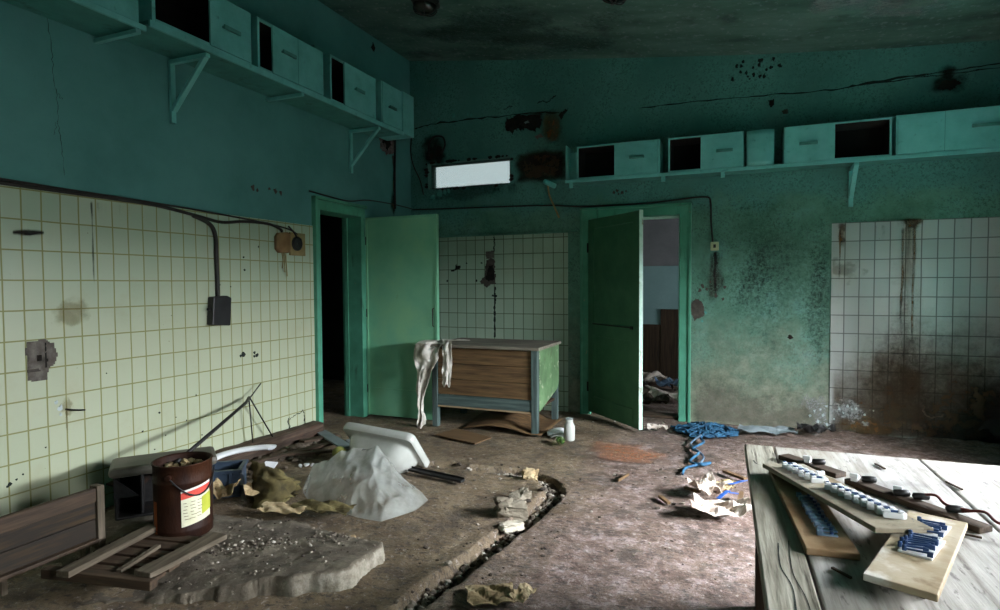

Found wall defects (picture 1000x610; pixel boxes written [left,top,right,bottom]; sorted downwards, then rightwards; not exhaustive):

crack [642,63,1000,108]
spalling [505,114,544,139]
spalling [424,155,513,200]
spalling [476,250,496,297]
damp [708,252,724,297]
rust [900,219,922,335]
spalling [25,339,58,382]
damp [807,353,1000,444]